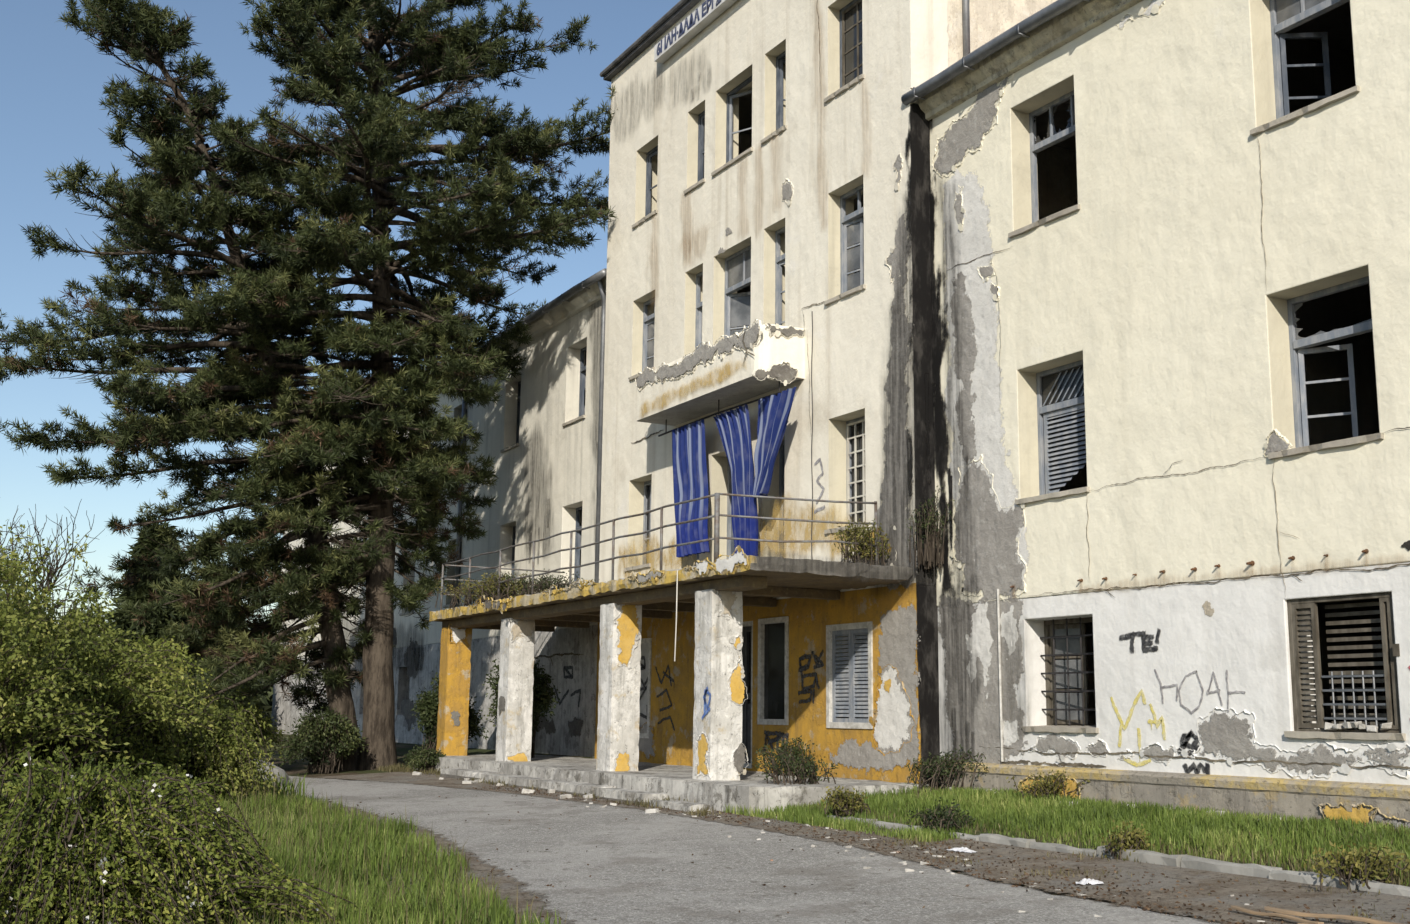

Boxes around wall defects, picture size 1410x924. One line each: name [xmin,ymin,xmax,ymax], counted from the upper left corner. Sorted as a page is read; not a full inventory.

flaking render [613,212,921,778]
damp [754,103,978,784]
flaking render [893,153,903,191]
peeling [932,73,1410,799]